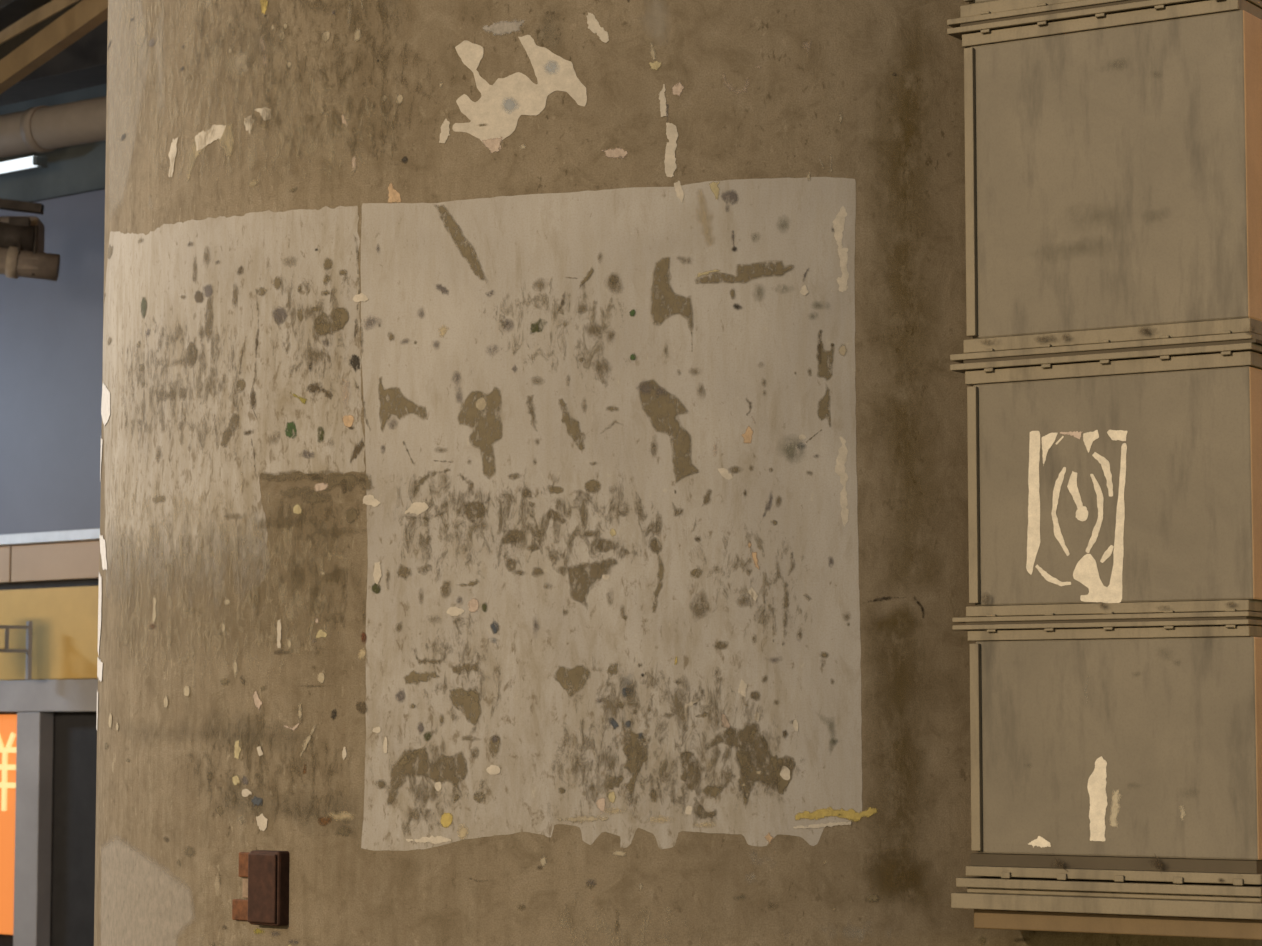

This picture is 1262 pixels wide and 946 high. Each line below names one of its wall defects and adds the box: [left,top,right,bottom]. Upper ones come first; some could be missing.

peeling [439,20,587,154]
peeling [125,253,239,446]
peeling [257,249,368,369]
peeling [436,205,484,279]
peeling [651,257,692,333]
peeling [100,383,110,481]
peeling [455,374,502,477]
peeling [640,380,698,493]
peeling [372,449,664,612]
peeling [96,532,119,731]
peeling [372,644,500,844]
peeling [555,664,794,826]